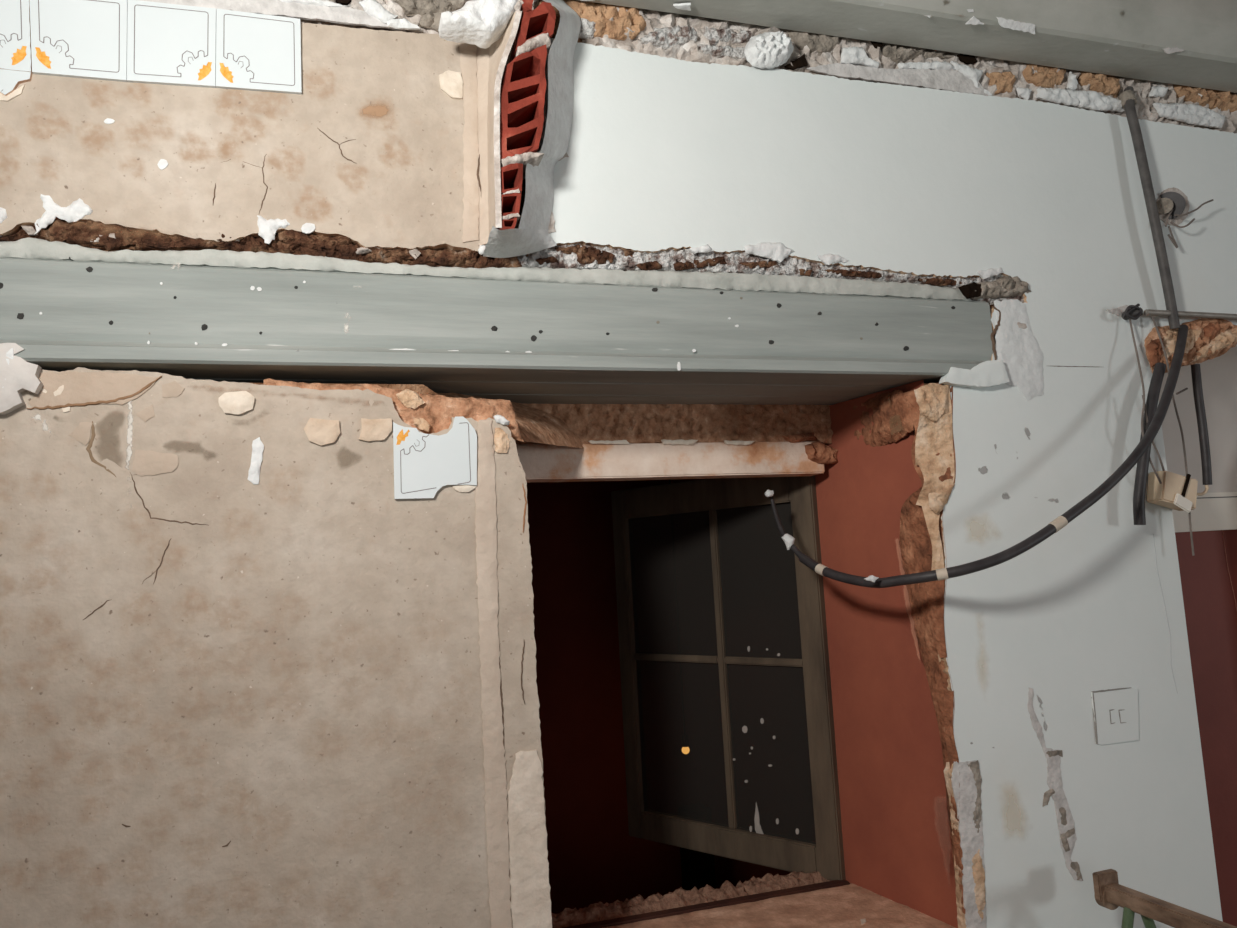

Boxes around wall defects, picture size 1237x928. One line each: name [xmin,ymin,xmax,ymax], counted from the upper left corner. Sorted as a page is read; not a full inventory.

spalling [279,0,420,30]
spalling [784,53,808,70]
spalling [840,41,883,68]
spalling [897,54,992,96]
spalling [1016,72,1125,112]
spalling [1148,86,1225,129]
crack [318,128,355,163]
spalling [0,219,1031,309]
flaking render [264,378,838,464]
crack [130,473,206,584]
spalling [853,383,987,928]
peeling [1043,789,1083,881]